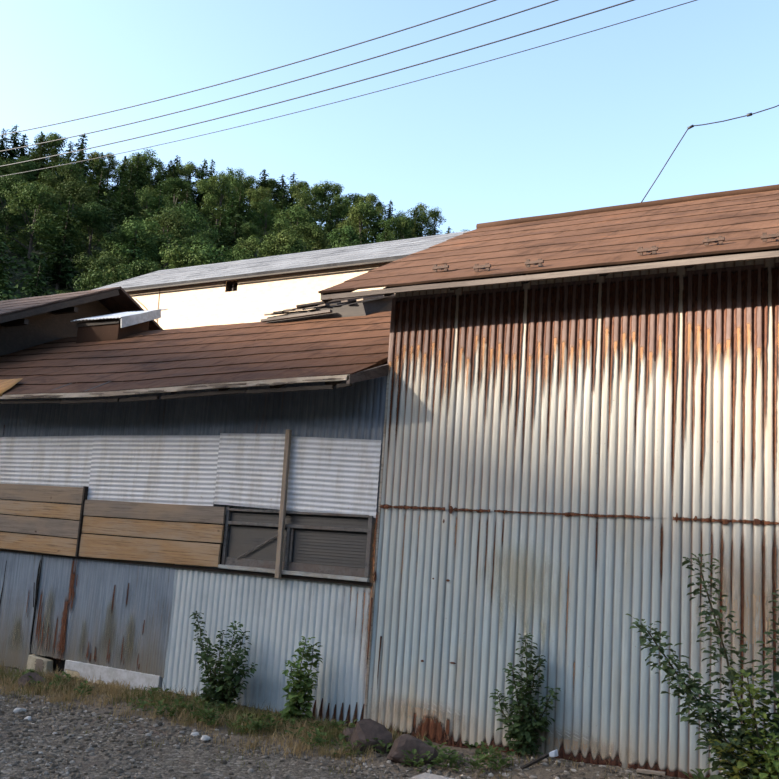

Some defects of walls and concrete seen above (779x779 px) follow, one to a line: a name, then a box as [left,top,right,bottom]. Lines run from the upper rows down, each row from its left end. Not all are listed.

corrosion [388,263,779,487]
corrosion [25,559,78,658]
corrosion [344,504,650,664]
corrosion [673,513,779,699]
corrosion [388,713,517,754]
corrosion [554,742,710,779]